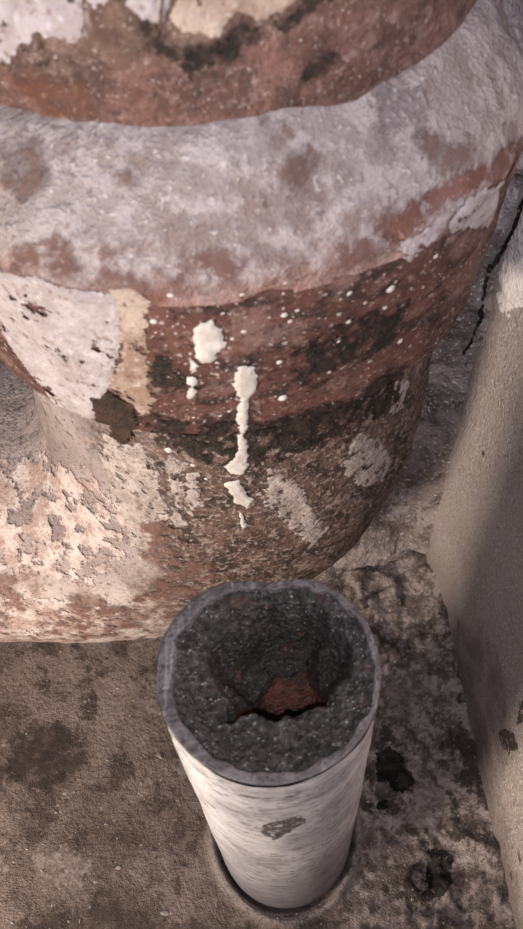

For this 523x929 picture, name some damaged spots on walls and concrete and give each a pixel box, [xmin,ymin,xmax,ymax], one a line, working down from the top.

peeling [0,0,108,64]
peeling [125,0,297,38]
spalling [370,73,434,156]
peeling [448,181,505,233]
peeling [398,227,438,263]
crack [462,198,523,355]
peeling [0,269,157,419]
peeling [389,380,409,414]
peeling [340,432,393,487]
peeling [0,430,170,588]
peeling [256,462,330,548]
peeling [0,594,123,637]